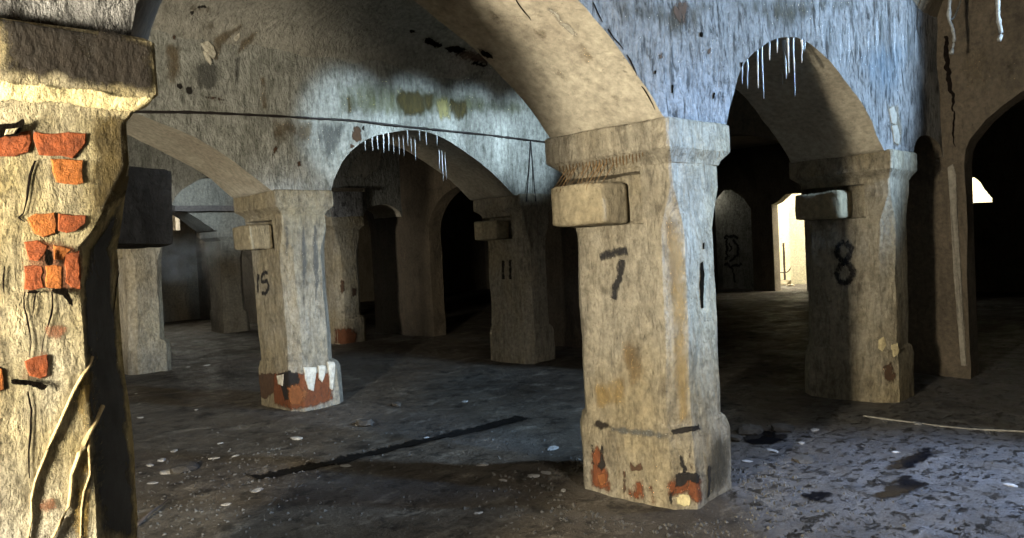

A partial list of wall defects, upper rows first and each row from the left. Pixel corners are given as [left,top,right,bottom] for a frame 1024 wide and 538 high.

crack [943,36,956,147]
flaking render [0,119,86,185]
flaking render [24,213,86,306]